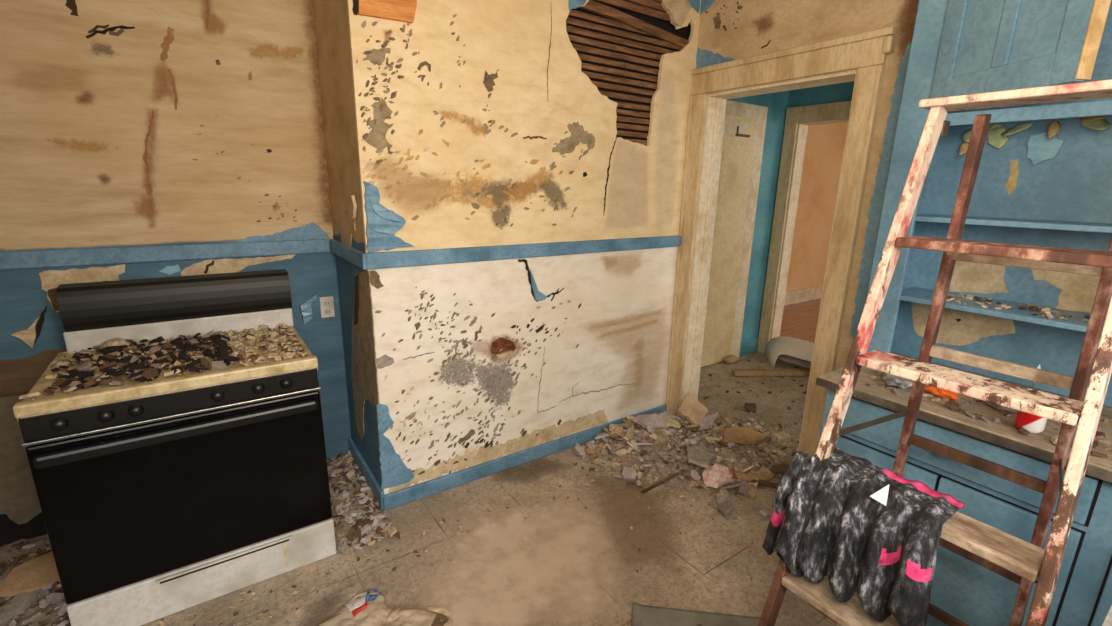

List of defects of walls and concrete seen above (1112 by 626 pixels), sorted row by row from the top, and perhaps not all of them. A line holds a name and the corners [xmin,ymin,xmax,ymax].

flaking render [566,0,743,146]
peeling [352,0,443,253]
water stain [361,129,577,227]
crack [604,134,617,211]
flaking render [0,264,125,396]
peeling [911,302,1015,346]
peeling [950,260,1008,294]
peeling [1031,269,1101,313]
peeling [351,269,608,493]